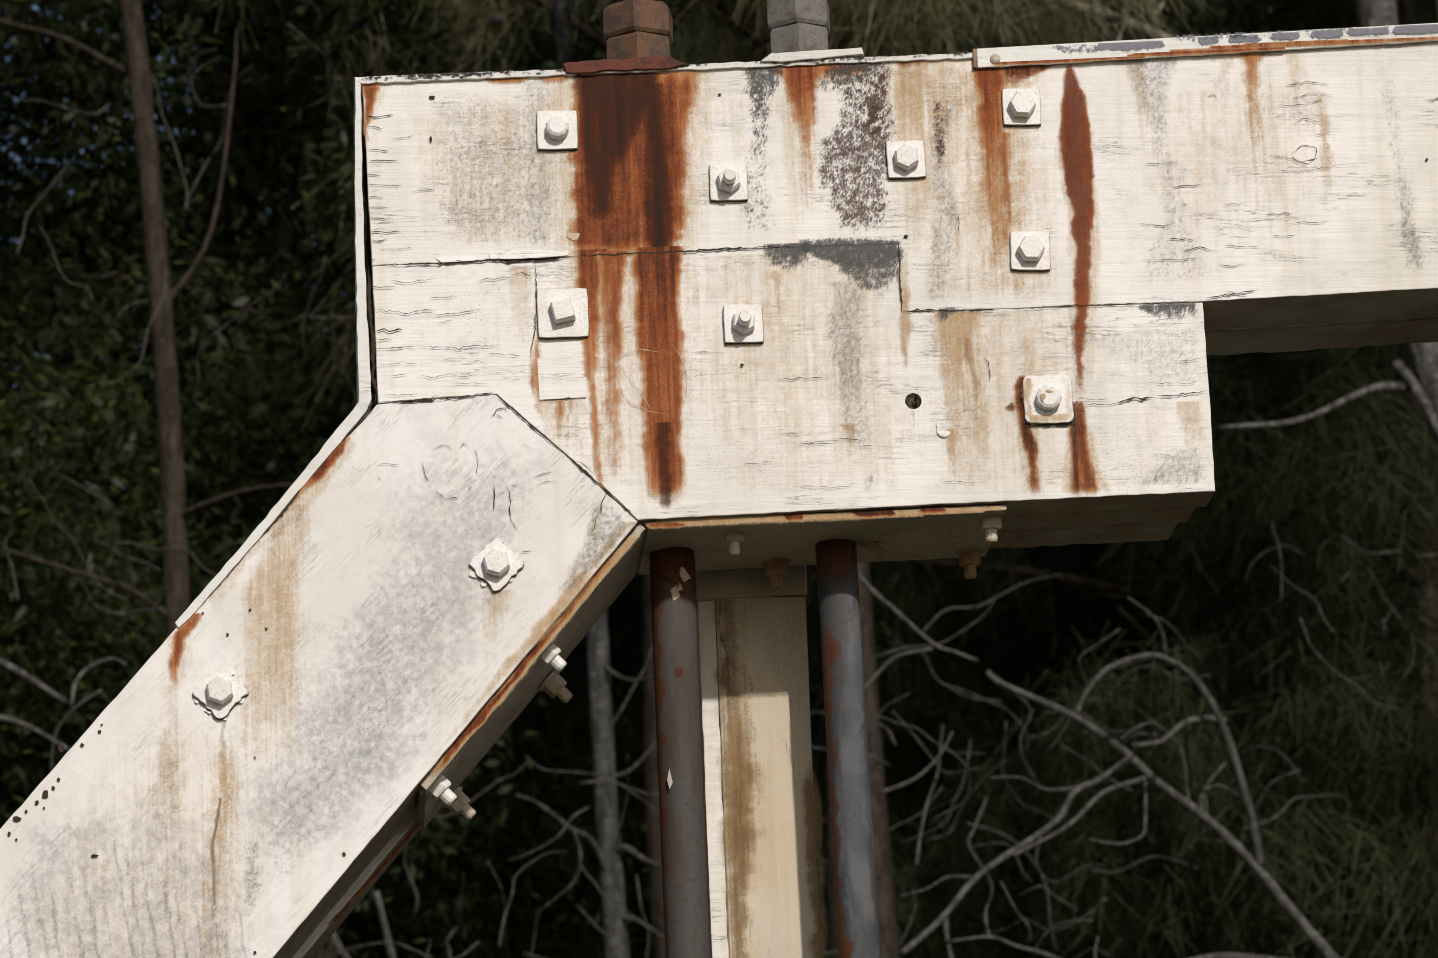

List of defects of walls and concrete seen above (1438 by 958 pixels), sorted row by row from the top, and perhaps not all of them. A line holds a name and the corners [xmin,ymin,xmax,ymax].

rust [436,60,1002,768]
leakage [744,62,911,437]
leakage [915,62,982,434]
rust [974,36,1438,493]
rust [169,613,201,681]
rust [649,547,712,958]
rust [804,628,853,958]